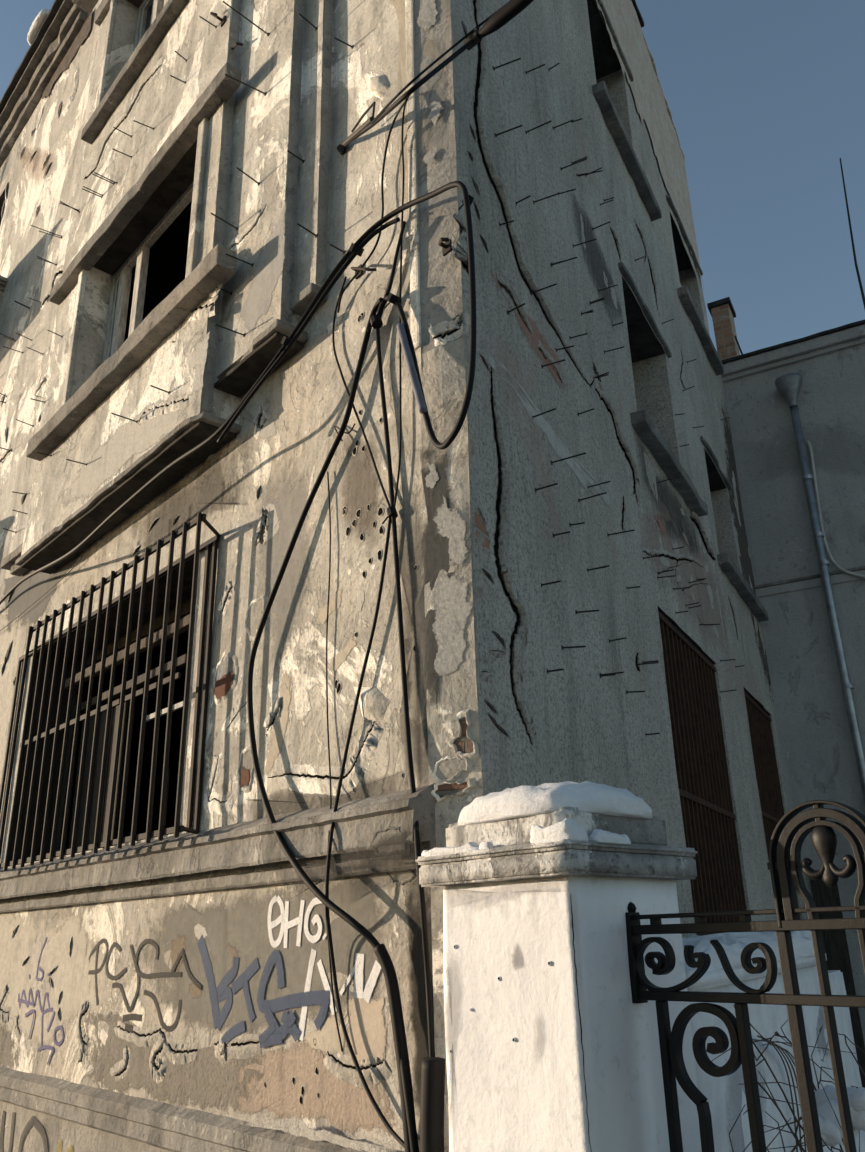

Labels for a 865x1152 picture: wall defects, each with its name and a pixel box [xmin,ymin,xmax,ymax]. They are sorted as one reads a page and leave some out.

crack [427,311,470,346]
crack [452,0,739,640]
peeling [425,462,492,676]
crack [491,367,538,746]
corrosion [214,672,234,699]
crack [203,692,283,816]
crack [267,720,384,796]
spalling [431,709,480,802]
crack [0,982,23,1043]
peeling [0,875,396,1152]
crack [323,1049,392,1089]